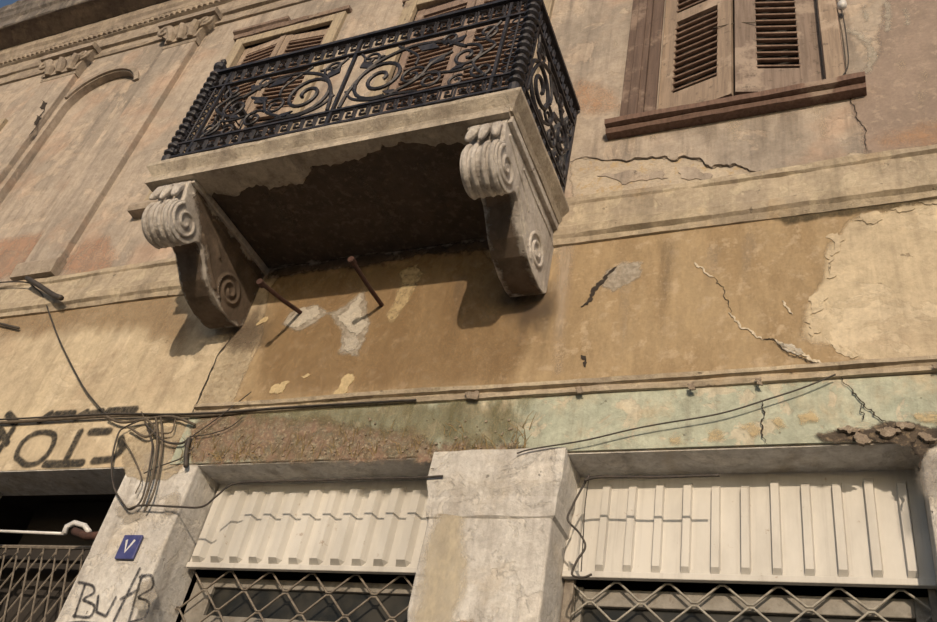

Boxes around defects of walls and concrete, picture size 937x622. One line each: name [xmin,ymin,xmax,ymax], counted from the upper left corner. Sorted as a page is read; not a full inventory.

spalling [145,108,511,268]
peeling [854,199,937,225]
spalling [581,262,641,307]
peeling [283,293,370,356]
crack [694,263,821,363]
peeling [805,289,828,338]
crack [759,399,767,444]
crack [841,377,887,424]
spalling [817,414,937,469]